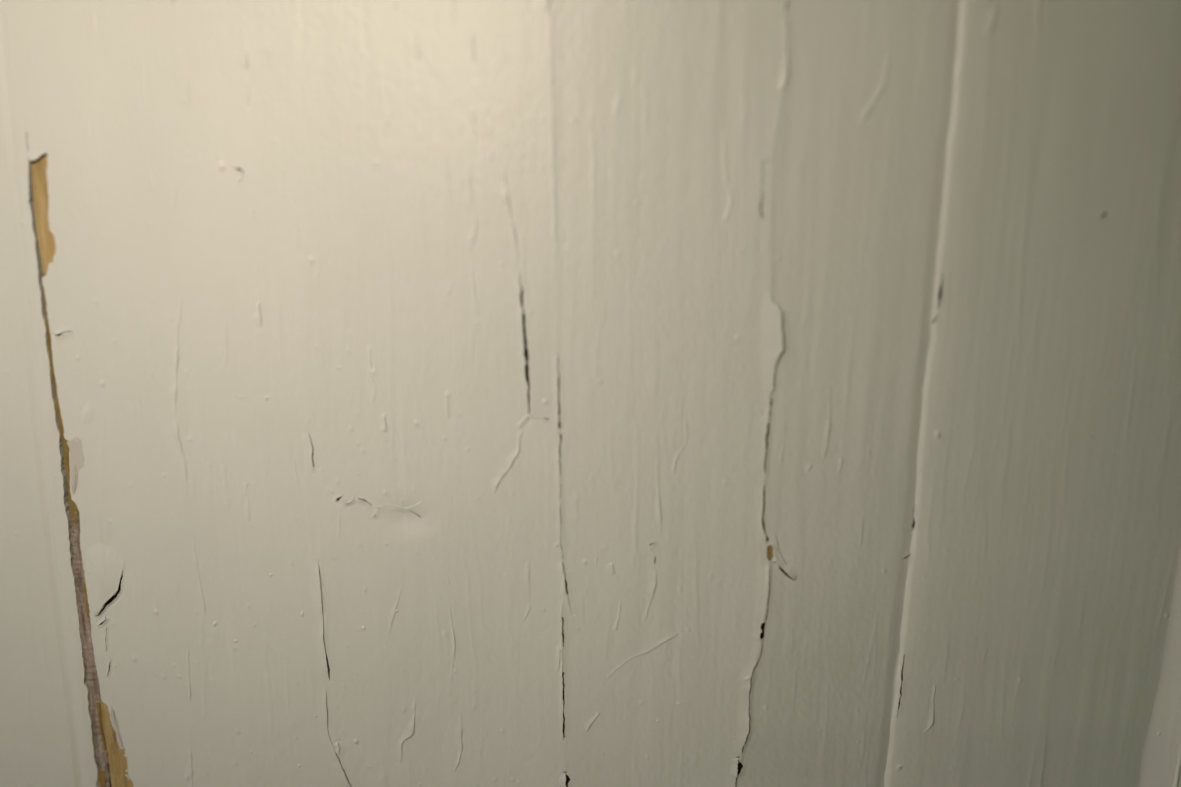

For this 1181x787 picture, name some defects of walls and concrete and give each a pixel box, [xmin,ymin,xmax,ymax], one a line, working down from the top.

peeling [67,437,85,496]
crack [724,360,800,787]
peeling [110,705,124,749]